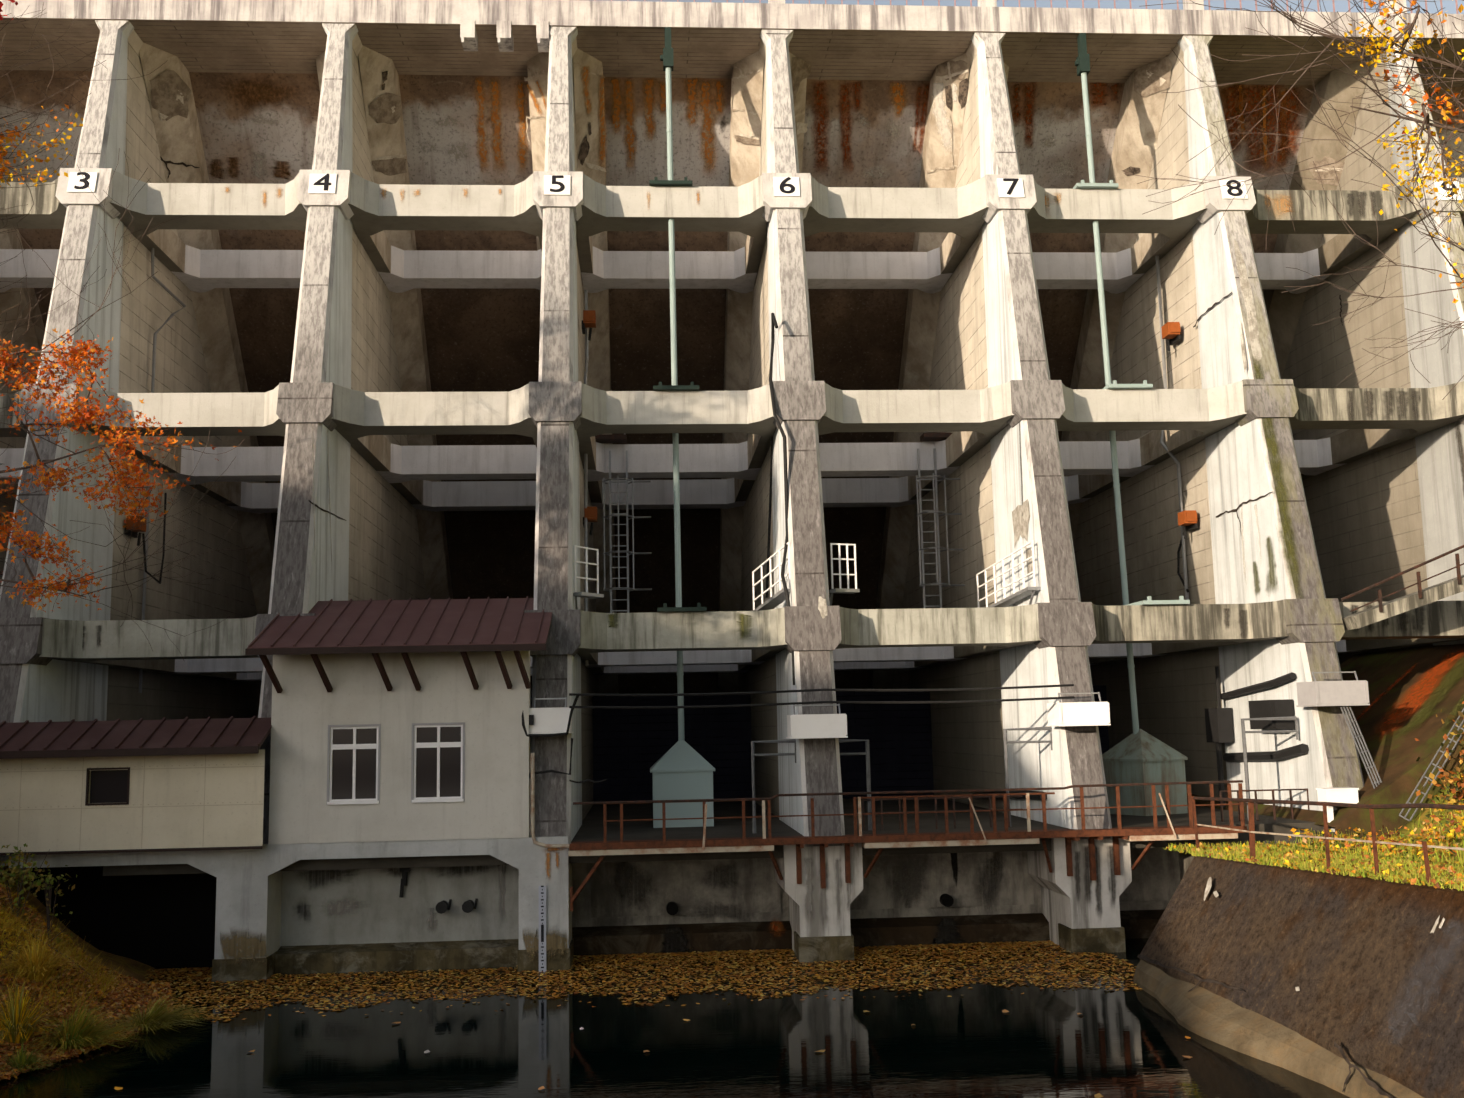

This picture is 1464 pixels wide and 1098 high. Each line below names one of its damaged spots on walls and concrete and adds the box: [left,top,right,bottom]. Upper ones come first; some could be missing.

spalling [368,71,402,124]
rust [476,79,546,167]
rust [582,67,666,164]
rust [685,78,724,168]
rust [814,82,862,170]
rust [891,83,930,152]
rust [1222,84,1301,170]
spalling [372,154,407,176]
crack [1193,292,1232,328]
crack [1216,492,1272,532]
crack [1334,1041,1393,1098]